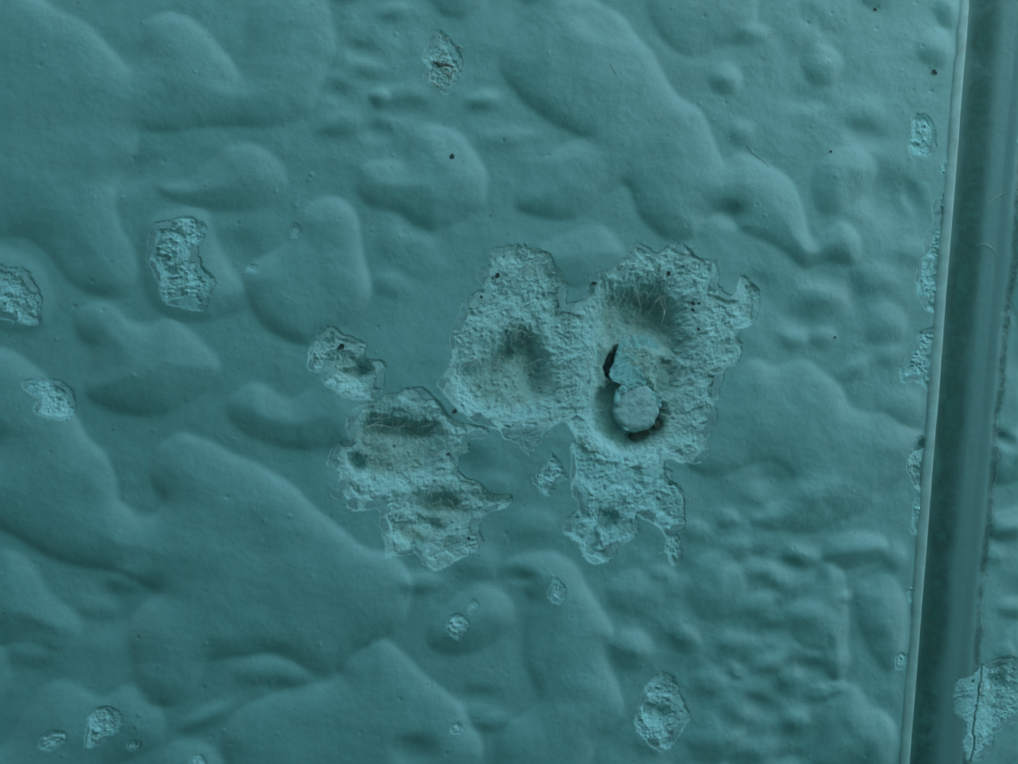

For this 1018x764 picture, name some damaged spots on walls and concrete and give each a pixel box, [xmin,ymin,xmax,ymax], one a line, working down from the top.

peeling [422,30,463,95]
peeling [908,113,937,157]
peeling [0,264,42,325]
peeling [146,216,215,310]
peeling [915,191,944,313]
peeling [22,377,76,421]
spalling [307,242,761,571]
peeling [900,327,934,392]
peeling [634,672,691,752]
peeling [952,656,1018,762]